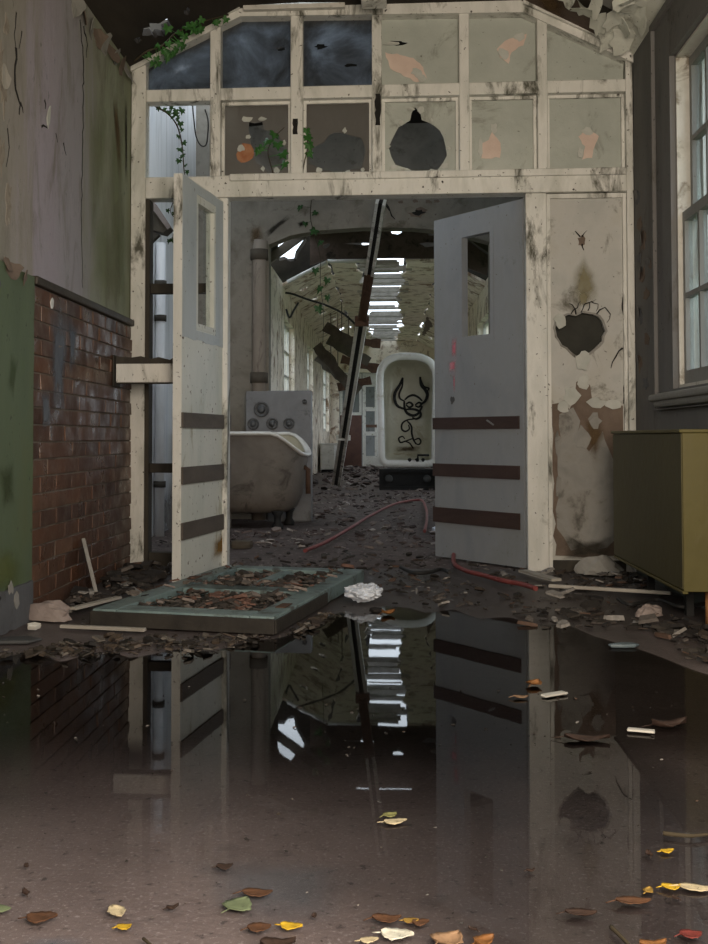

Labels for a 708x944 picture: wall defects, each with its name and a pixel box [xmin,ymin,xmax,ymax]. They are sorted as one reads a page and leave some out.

peeling [521,0,648,56]
flaking render [552,299,623,557]
spalling [0,581,20,609]